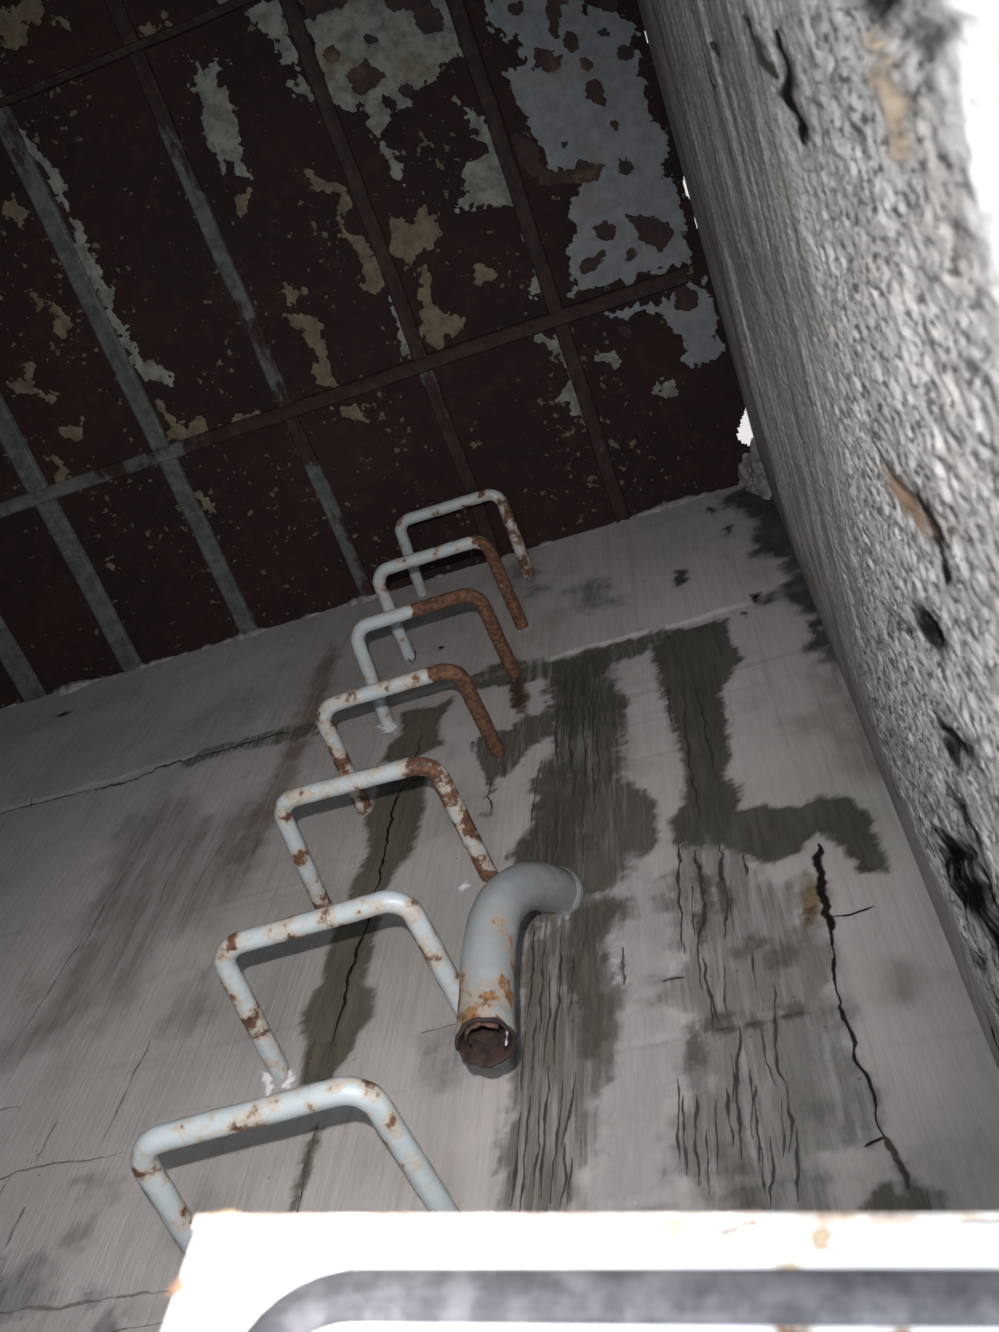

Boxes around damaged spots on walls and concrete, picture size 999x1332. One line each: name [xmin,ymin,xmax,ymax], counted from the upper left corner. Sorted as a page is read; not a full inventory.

peeling [187,55,253,218]
peeling [244,0,314,103]
peeling [300,0,464,187]
peeling [451,95,513,214]
peeling [484,0,692,300]
peeling [19,129,175,387]
peeling [304,168,466,362]
peeling [604,276,726,369]
spalling [888,599,948,658]
damp [471,487,888,1213]
spalling [931,791,999,1002]
crack [812,843,910,1189]